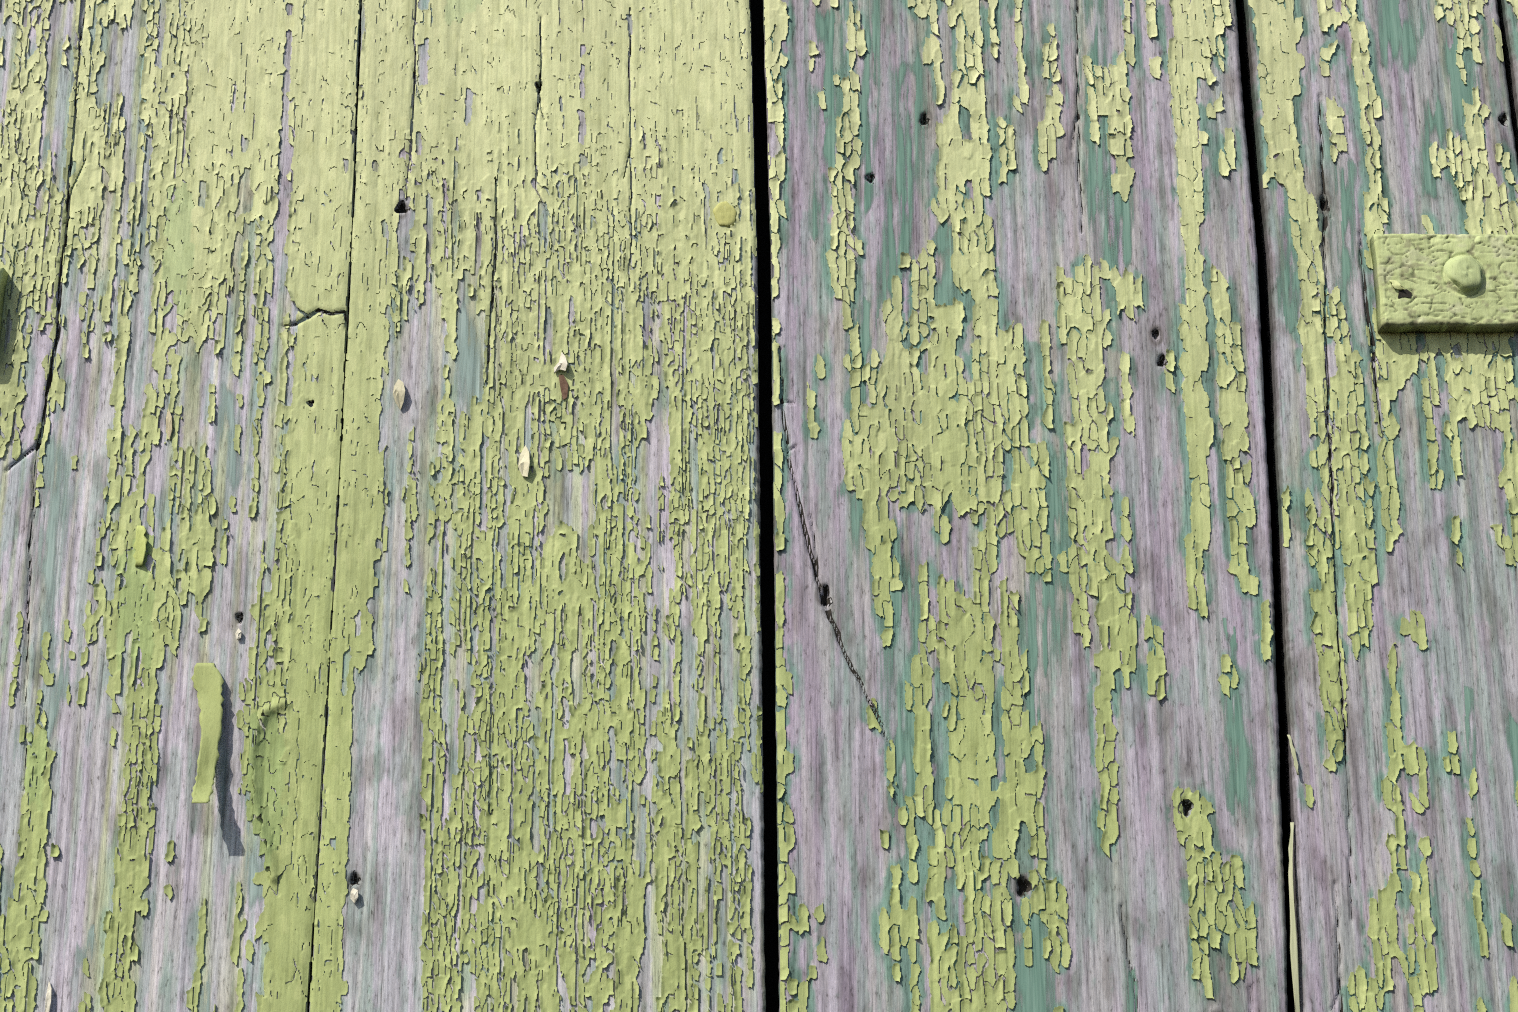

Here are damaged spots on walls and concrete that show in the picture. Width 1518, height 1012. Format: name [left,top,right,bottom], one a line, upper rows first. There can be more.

peeling [908,0,1065,252]
peeling [1083,0,1162,202]
peeling [1317,0,1389,270]
peeling [1429,0,1518,235]
crack [287,309,348,331]
crack [778,353,890,744]
peeling [866,254,1144,1012]
peeling [1184,263,1273,662]
peeling [1281,219,1453,772]
peeling [191,663,299,1012]
peeling [1172,786,1258,999]
peeling [1347,609,1478,1012]